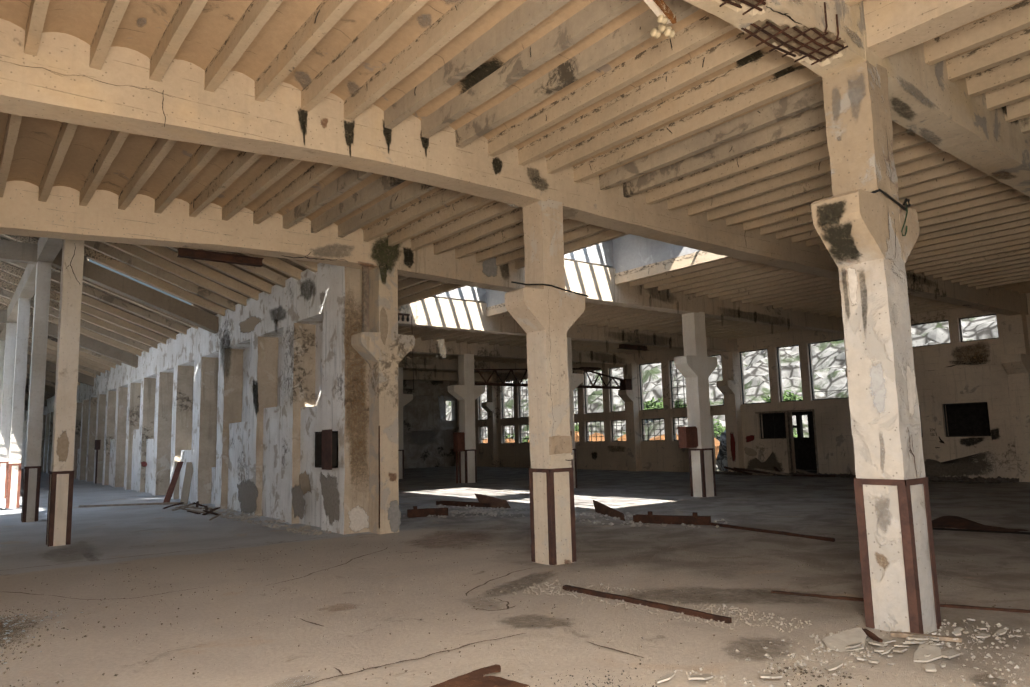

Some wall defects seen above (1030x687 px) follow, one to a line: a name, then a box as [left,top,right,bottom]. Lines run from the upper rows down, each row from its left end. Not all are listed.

spalling [719,0,863,65]
crack [4,61,171,127]
peeling [239,316,260,333]
damp [343,300,368,477]
peeling [237,479,258,514]
peeling [291,426,380,532]